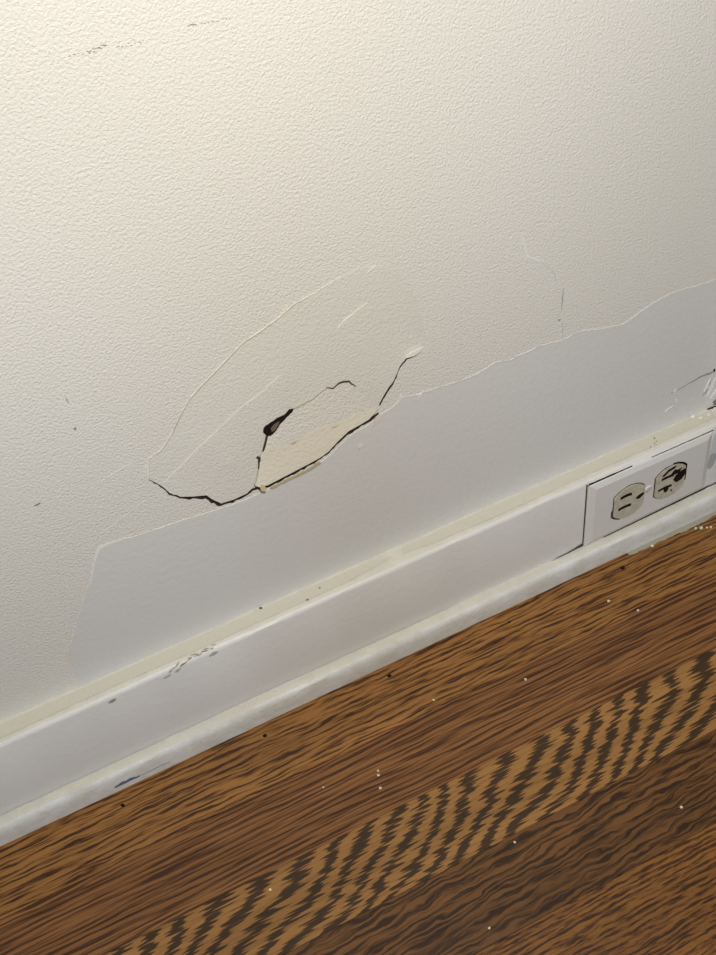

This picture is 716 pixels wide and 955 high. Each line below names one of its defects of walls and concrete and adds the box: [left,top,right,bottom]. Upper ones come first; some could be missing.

crack [150,295,412,506]
flaking render [254,408,382,492]